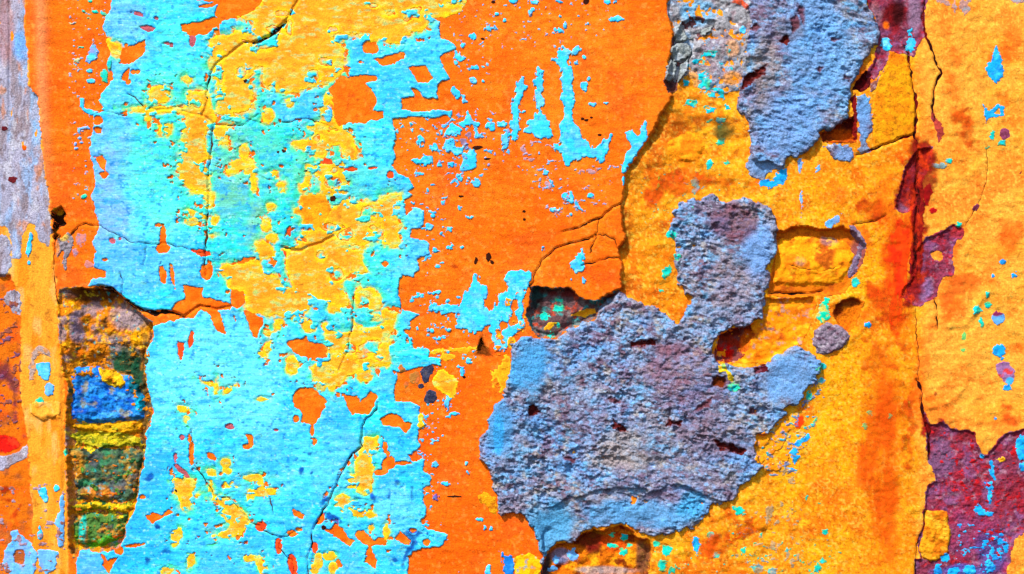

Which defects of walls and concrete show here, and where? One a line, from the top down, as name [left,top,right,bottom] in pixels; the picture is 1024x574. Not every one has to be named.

crack [244,9,293,44]
crack [53,59,334,318]
peeling [0,0,625,574]
crack [529,203,622,290]
peeling [475,0,928,574]
corrosion [856,138,937,351]
crack [913,299,938,460]
crack [191,403,378,574]
crack [914,511,925,574]